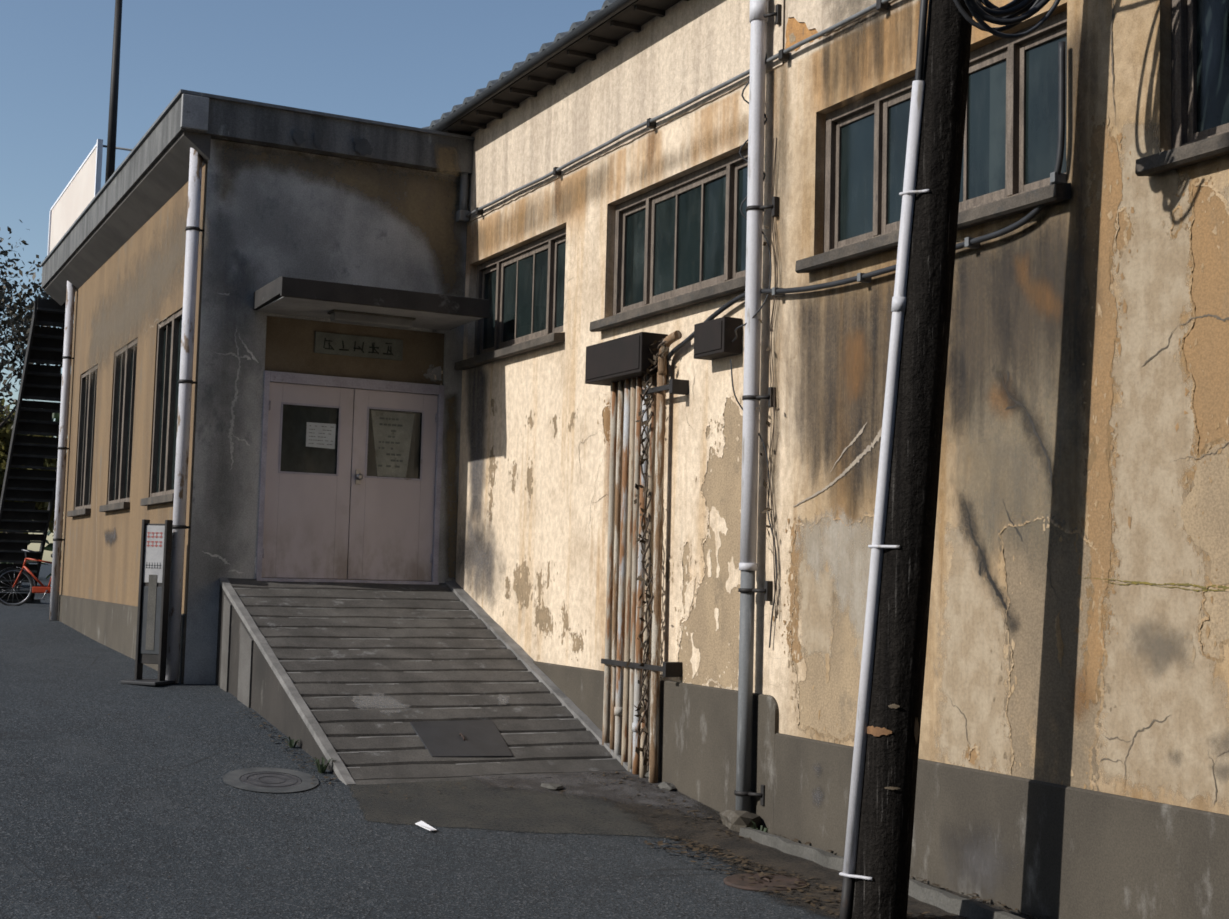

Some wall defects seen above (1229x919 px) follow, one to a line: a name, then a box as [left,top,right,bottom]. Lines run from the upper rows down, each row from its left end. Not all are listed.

flaking render [785,18,822,52]
water stain [477,170,609,246]
water stain [949,34,1086,555]
crack [215,329,258,469]
water stain [446,365,494,594]
peeling [485,447,533,522]
peeling [503,557,586,662]
peeling [550,409,578,438]
peeling [665,393,743,690]
crack [1002,370,1229,596]
peeling [1161,168,1229,667]